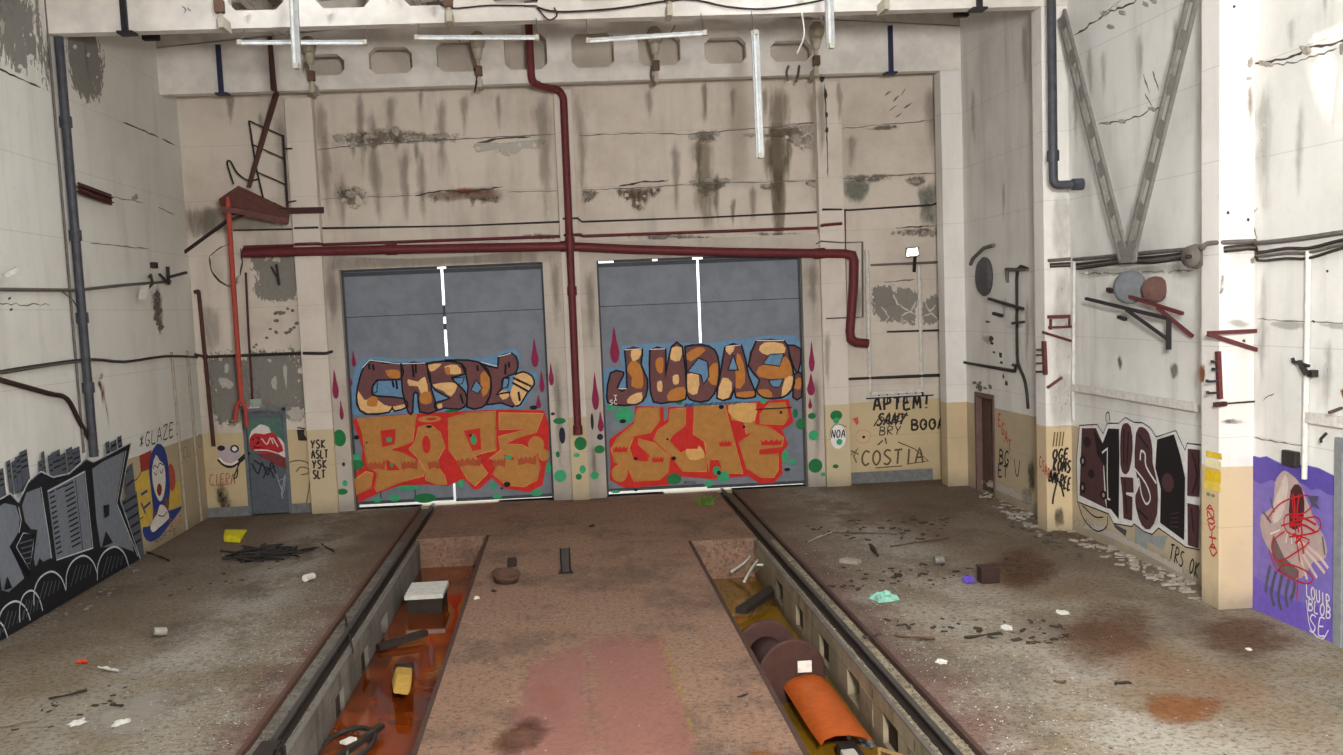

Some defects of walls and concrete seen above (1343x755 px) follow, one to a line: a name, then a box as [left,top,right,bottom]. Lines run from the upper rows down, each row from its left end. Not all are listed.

crack [0,68,40,88]
peeling [0,0,50,90]
peeling [66,36,105,103]
crack [1255,39,1343,67]
crack [0,300,49,308]
peeling [871,279,939,326]